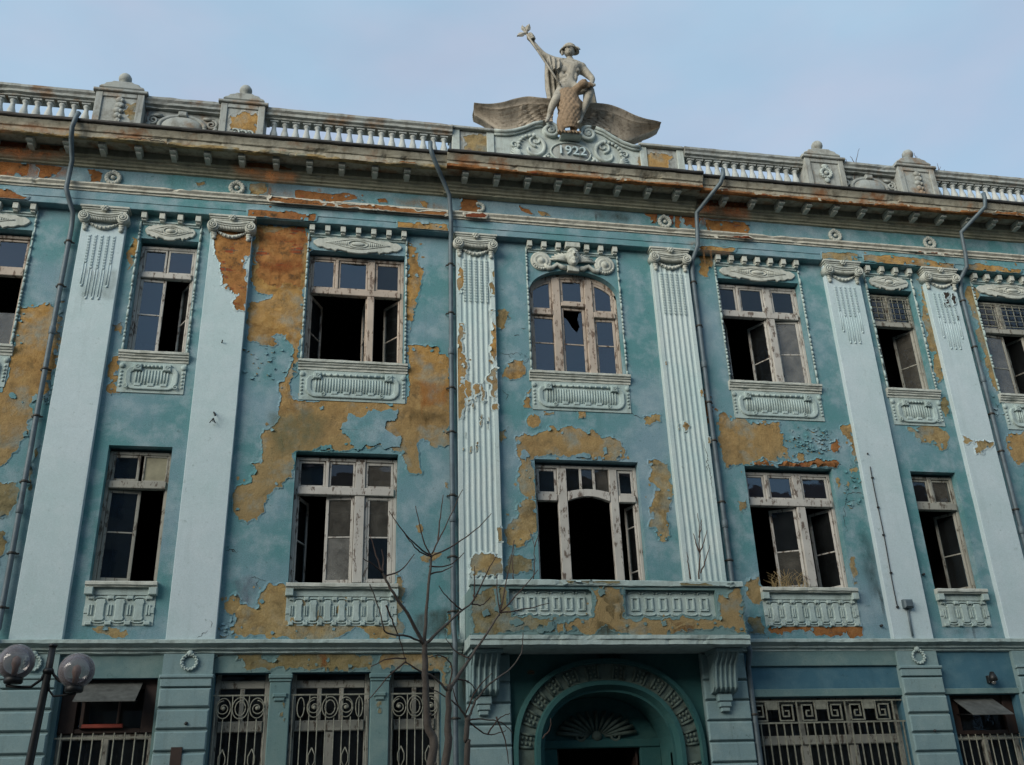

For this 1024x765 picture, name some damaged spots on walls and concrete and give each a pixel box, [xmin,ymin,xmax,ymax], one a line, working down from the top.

flaking render [461,132,496,152]
flaking render [0,161,64,200]
flaking render [86,169,104,182]
spalling [245,162,293,171]
flaking render [636,152,674,168]
flaking render [820,251,1024,467]
flaking render [210,182,865,639]
flaking render [0,301,65,566]
flaking render [235,653,451,687]